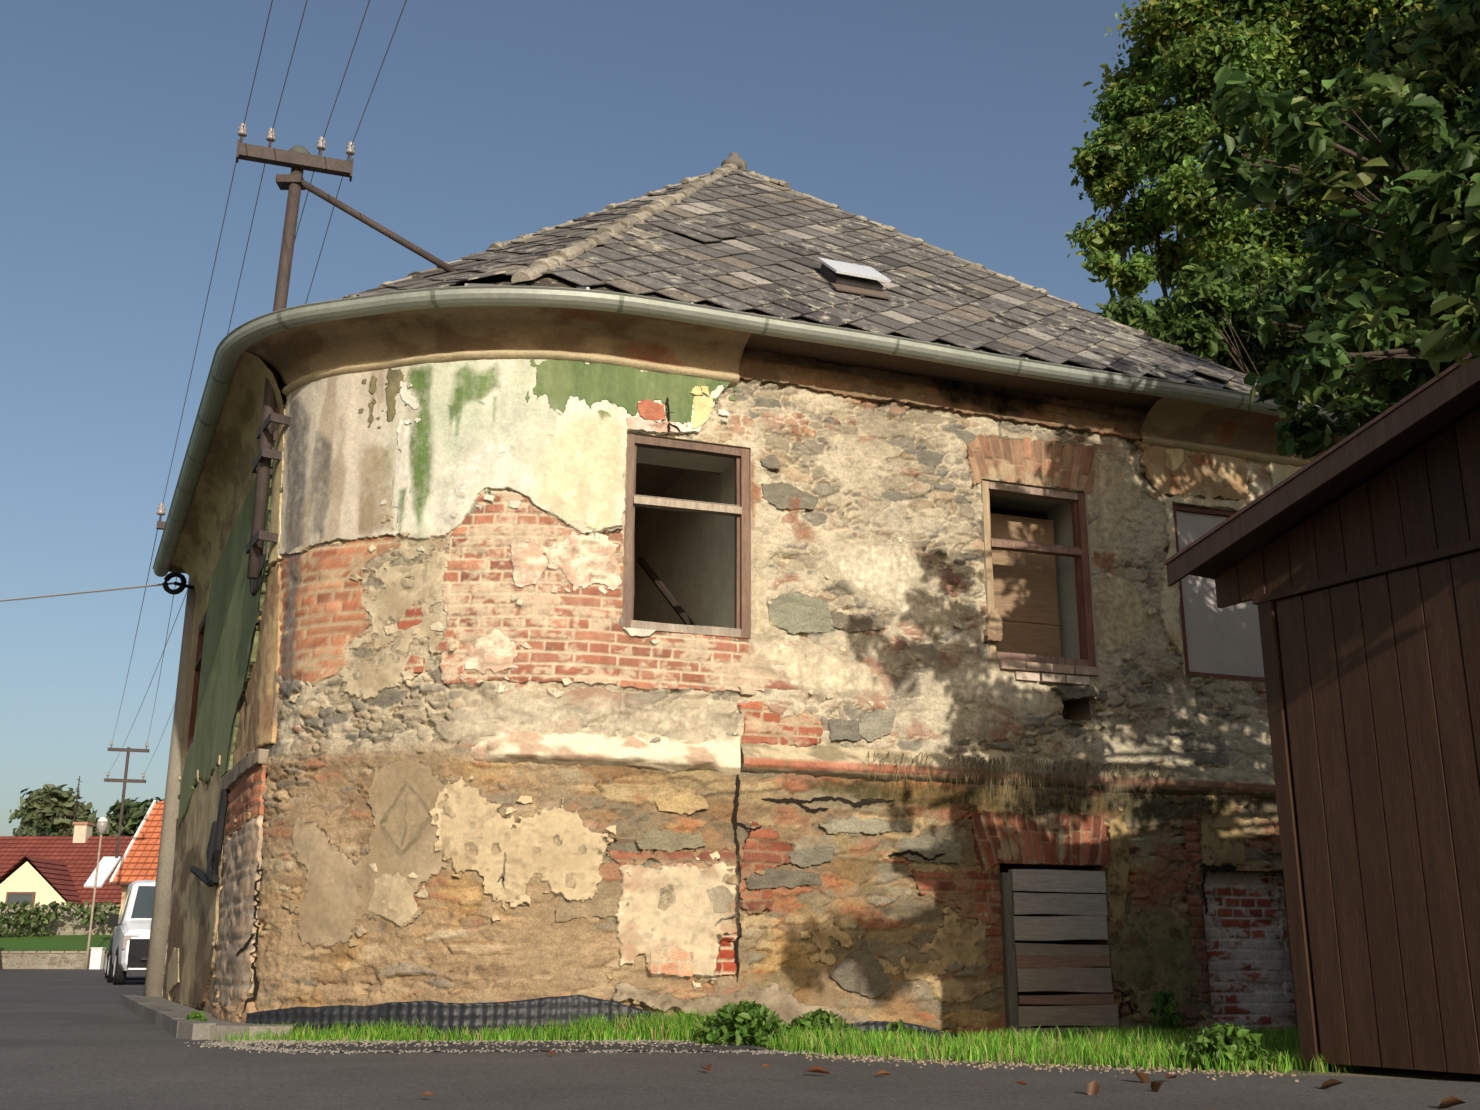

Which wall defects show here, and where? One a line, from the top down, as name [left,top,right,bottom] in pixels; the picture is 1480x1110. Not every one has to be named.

peeling [164,359,883,1009]
crack [236,869,263,1013]
crack [715,774,895,983]
spalling [890,868,1004,987]
peeling [1106,807,1141,930]
peeling [1199,795,1247,866]